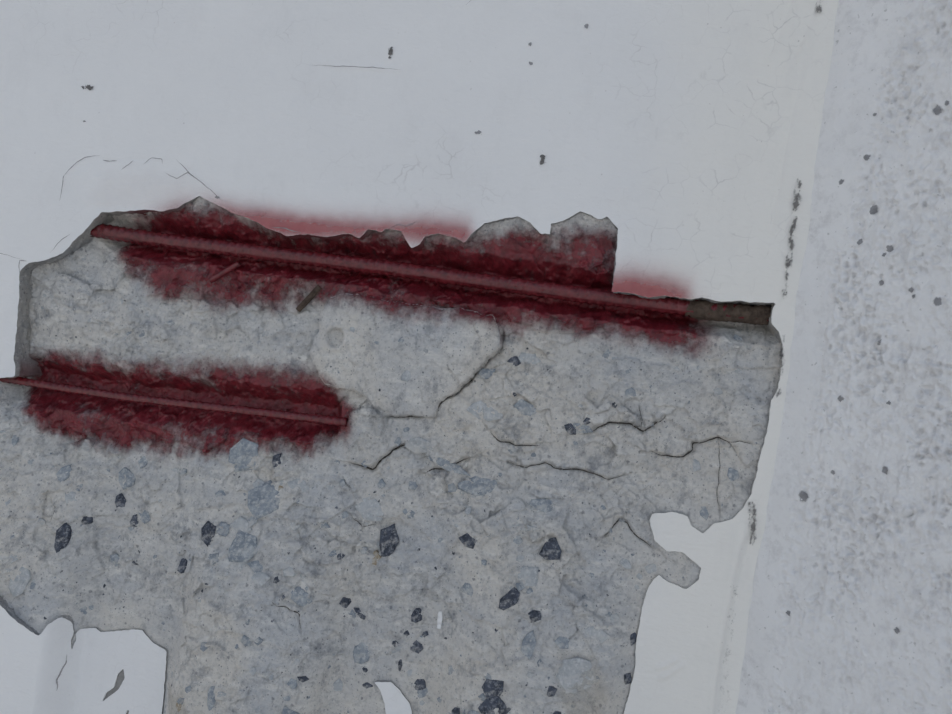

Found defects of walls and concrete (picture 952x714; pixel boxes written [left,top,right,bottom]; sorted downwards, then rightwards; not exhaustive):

crack [60,155,220,199]
spalling [186,196,272,234]
spalling [0,212,781,714]